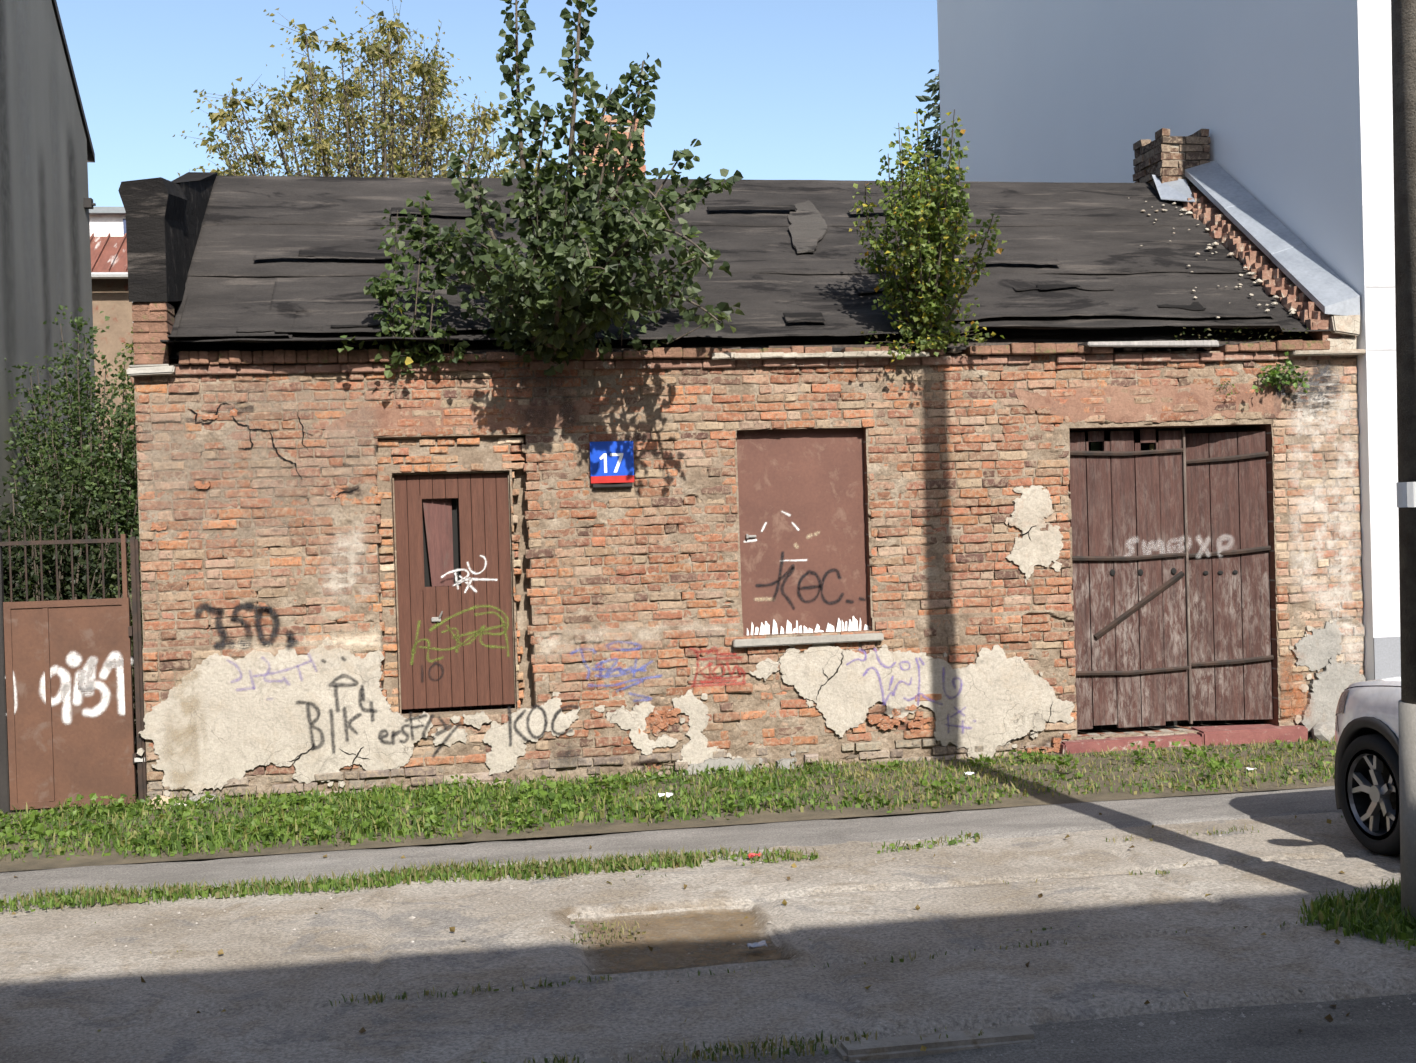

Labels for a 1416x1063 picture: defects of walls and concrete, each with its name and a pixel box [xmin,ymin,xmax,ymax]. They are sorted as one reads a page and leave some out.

crack [188,403,314,480]
peeling [1004,485,1063,585]
peeling [137,637,742,797]
peeling [749,643,1075,759]
peeling [1288,620,1366,740]